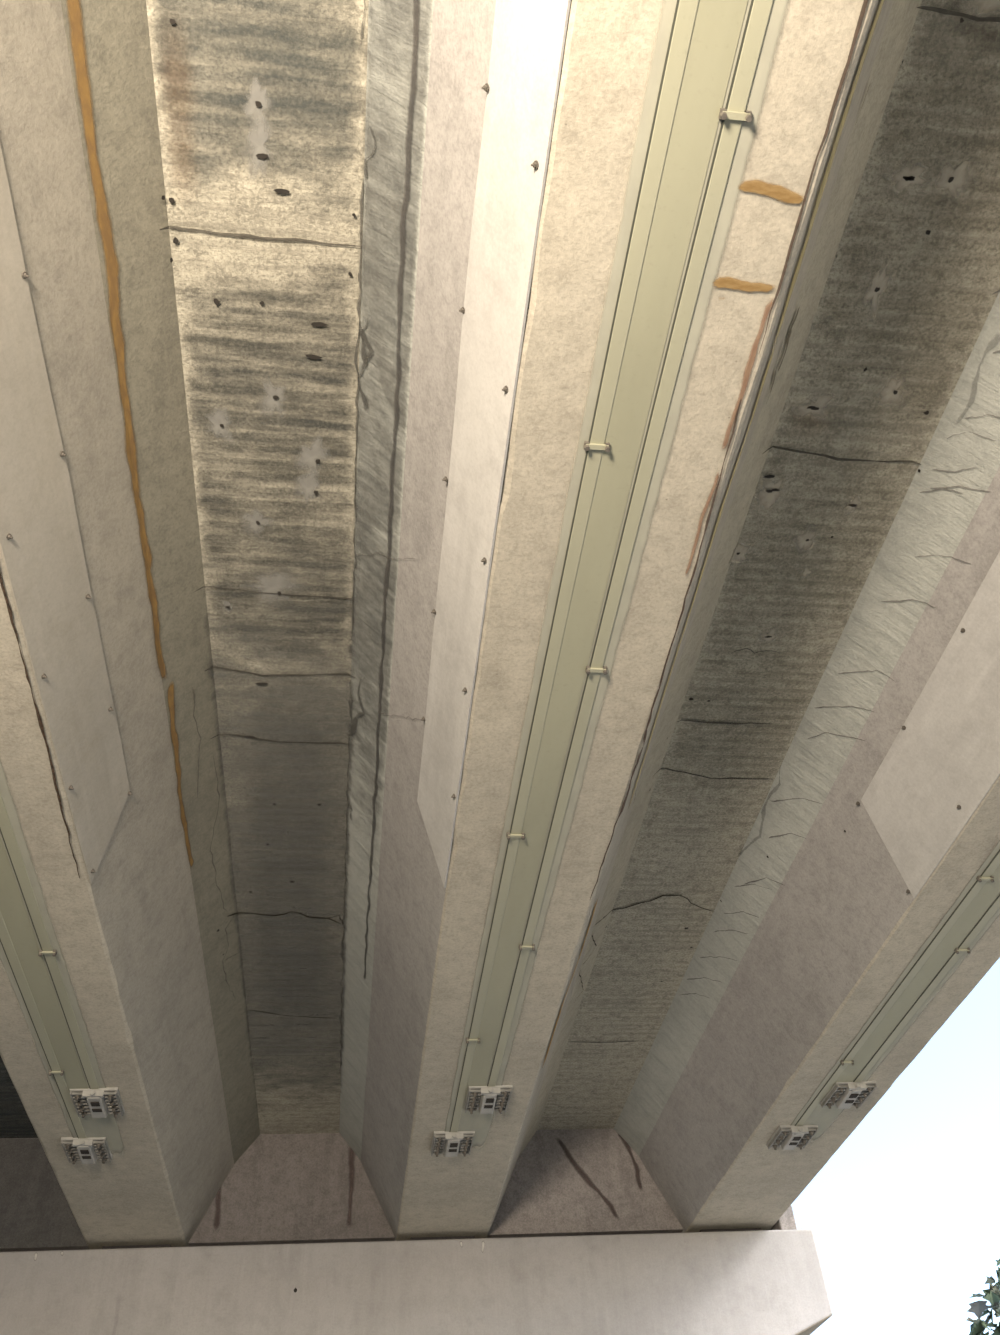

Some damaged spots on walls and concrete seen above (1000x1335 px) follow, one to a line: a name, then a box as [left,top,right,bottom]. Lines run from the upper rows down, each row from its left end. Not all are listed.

crack [759,0,868,353]
crack [0,573,80,878]
corrosion [67,0,194,867]
crack [193,689,343,995]
leakage [161,0,418,1085]
crack [575,399,785,1001]
corrosion [629,0,884,805]
crack [808,706,873,741]
crack [882,599,935,608]
crack [920,414,1000,494]